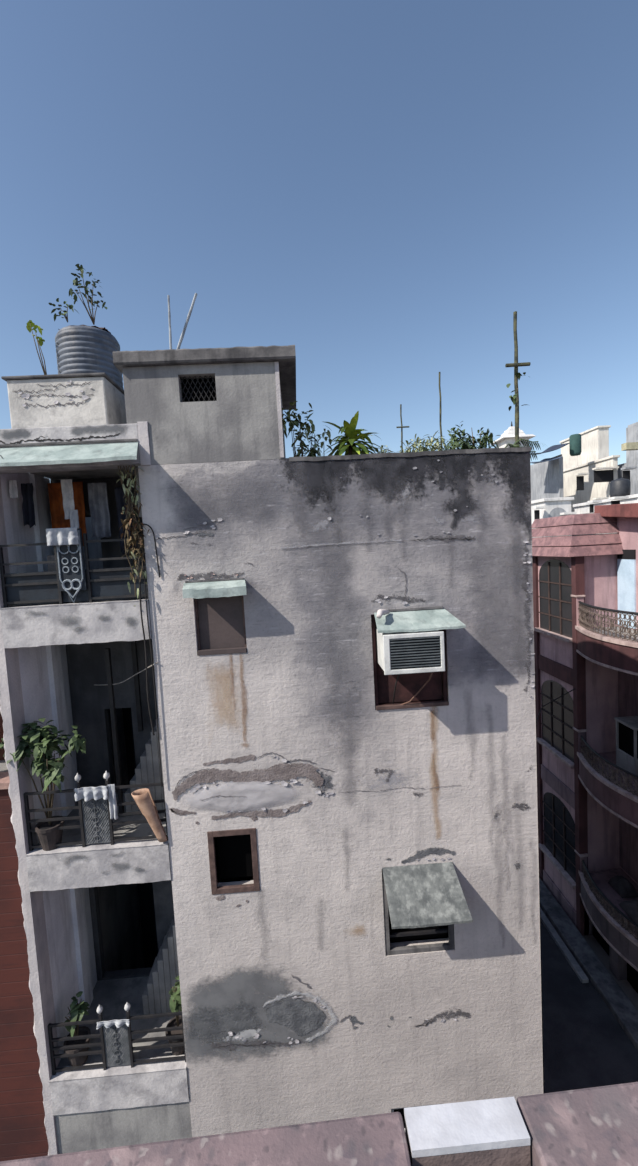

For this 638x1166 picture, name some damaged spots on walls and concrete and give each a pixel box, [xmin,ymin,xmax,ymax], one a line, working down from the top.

crack [14,380,93,408]
crack [0,433,120,444]
damp [283,447,532,540]
peeling [169,752,338,825]